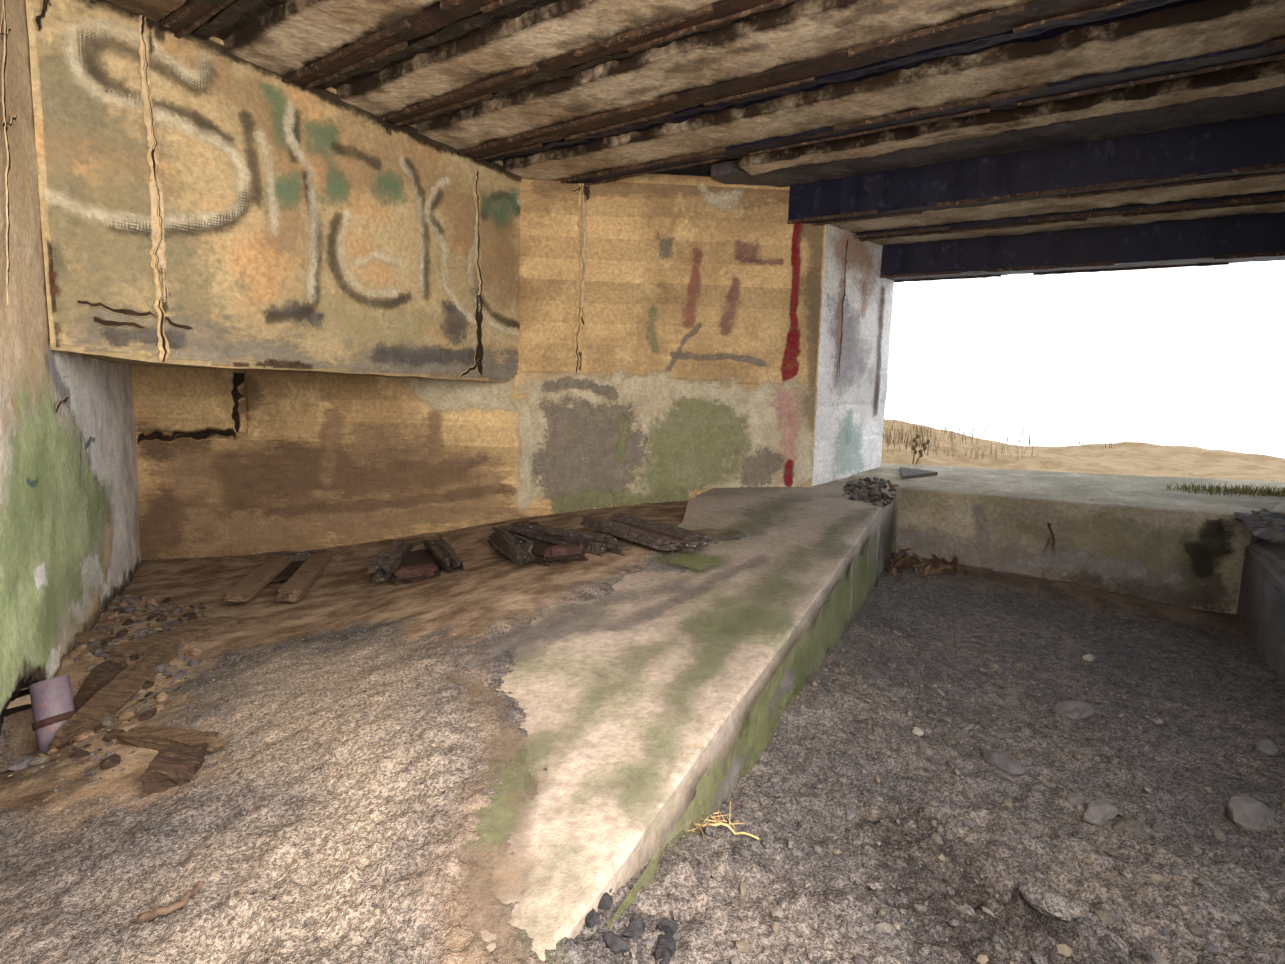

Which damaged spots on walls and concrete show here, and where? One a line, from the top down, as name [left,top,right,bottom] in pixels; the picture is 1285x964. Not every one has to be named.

crack [137,373,245,445]
damp [0,45,526,703]
damp [529,377,688,514]